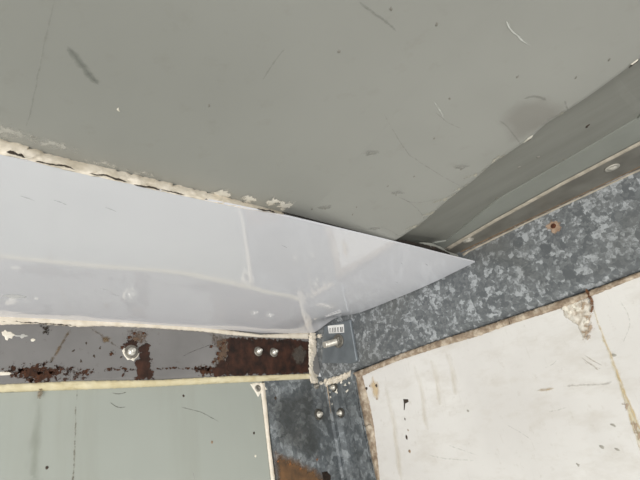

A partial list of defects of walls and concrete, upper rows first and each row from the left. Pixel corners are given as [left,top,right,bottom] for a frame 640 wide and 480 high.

spalling [562,299,592,340]
rust [2,361,94,383]
rust [107,330,309,380]
rust [277,456,331,480]